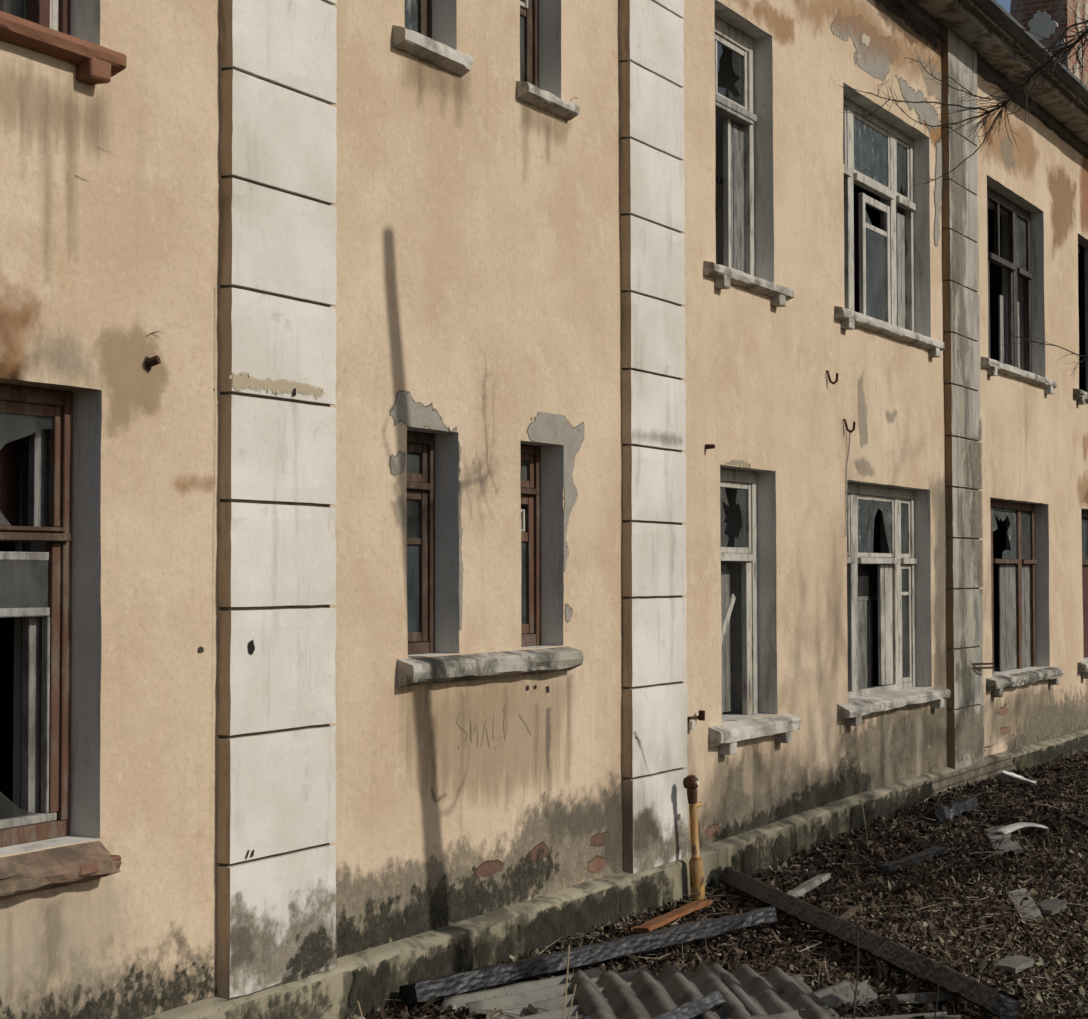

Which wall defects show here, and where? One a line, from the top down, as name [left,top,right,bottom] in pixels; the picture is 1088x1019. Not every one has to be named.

leakage [746,4,794,42]
peeling [830,8,943,131]
leakage [0,306,32,363]
peeling [229,372,325,398]
peeling [389,390,463,630]
peeling [527,412,584,572]
leakage [970,421,984,593]
leakage [231,662,985,993]
leakage [0,897,217,1019]